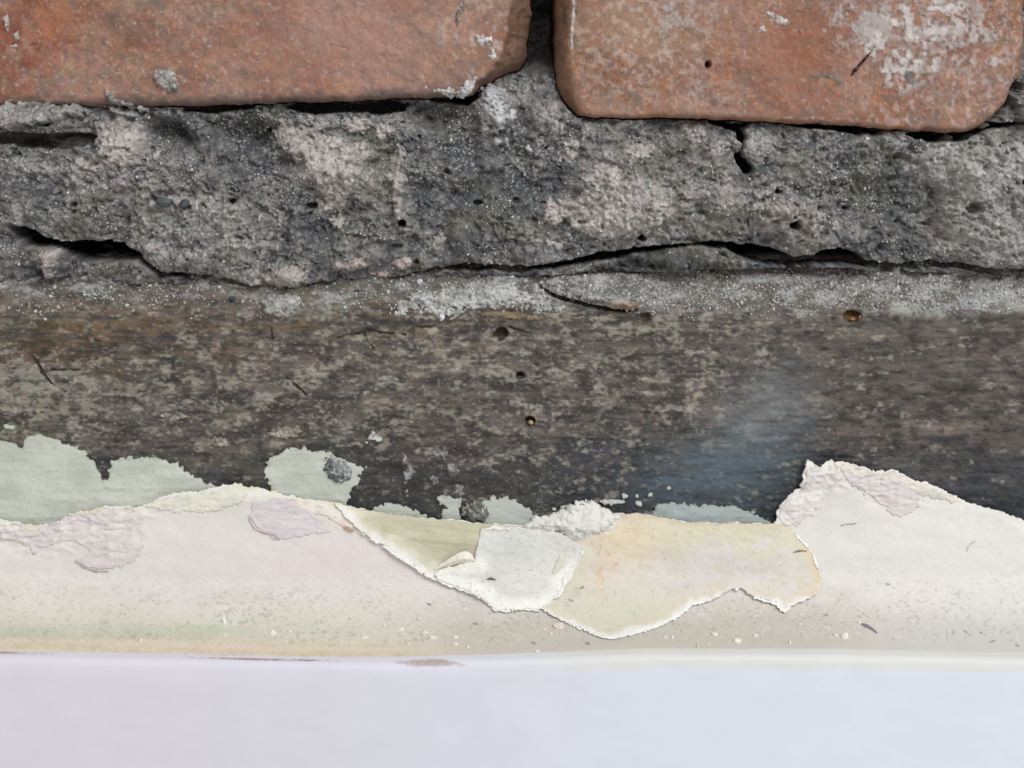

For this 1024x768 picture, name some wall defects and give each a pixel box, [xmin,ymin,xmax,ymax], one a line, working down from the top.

crack [708,120,752,173]
crack [794,122,1021,142]
crack [528,201,862,312]
peeling [204,436,229,447]
peeling [0,424,216,525]
peeling [264,425,367,505]
peeling [373,482,427,518]
peeling [430,476,463,520]
peeling [482,495,537,525]
peeling [587,486,771,524]